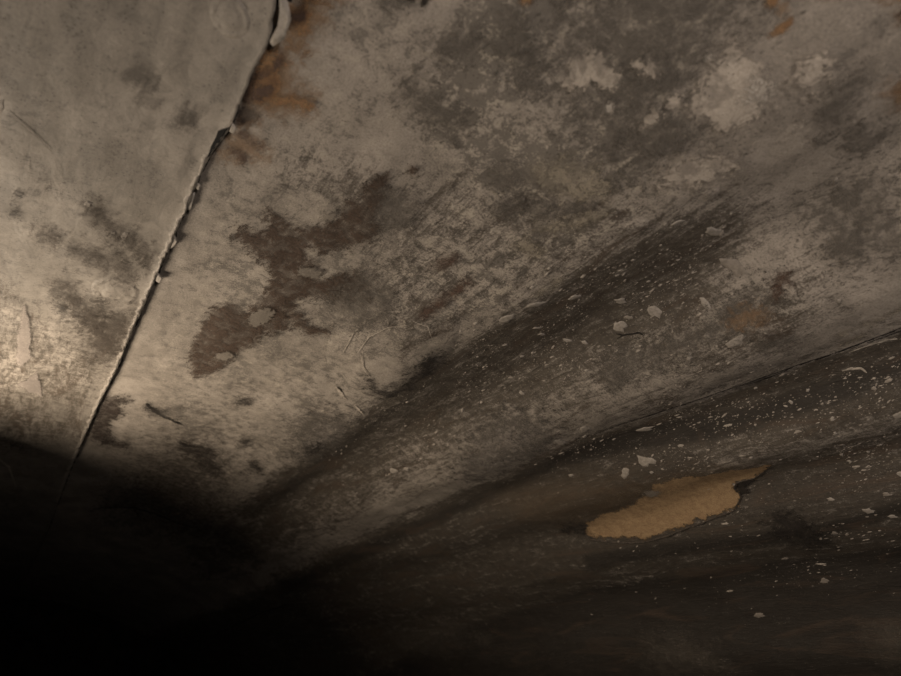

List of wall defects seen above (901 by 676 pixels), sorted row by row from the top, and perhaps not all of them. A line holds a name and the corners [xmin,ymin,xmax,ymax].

crack [268,0,278,43]
crack [198,67,256,183]
rust [216,0,325,165]
water stain [372,0,806,225]
crack [27,210,193,575]
water stain [361,350,446,400]
crack [566,328,900,446]
peeling [561,455,782,544]